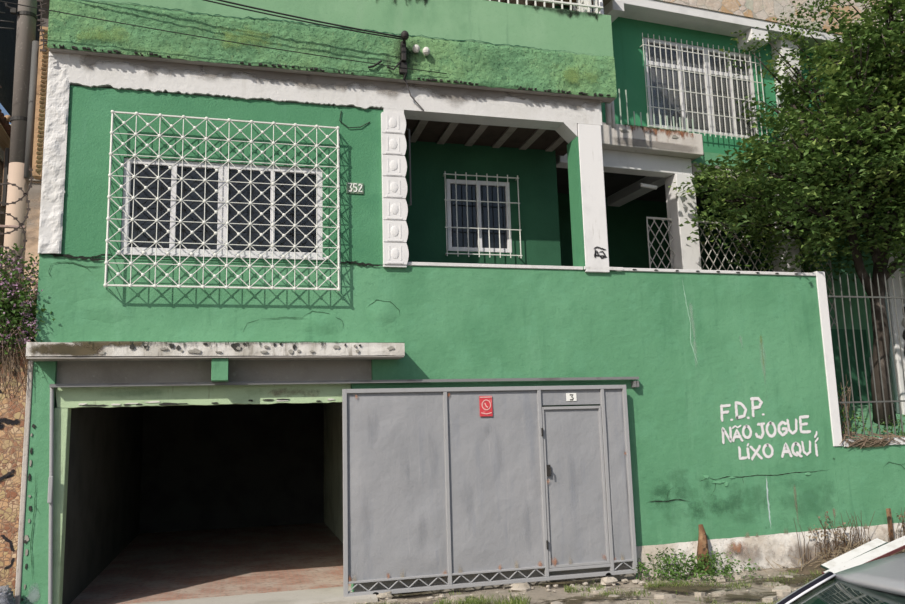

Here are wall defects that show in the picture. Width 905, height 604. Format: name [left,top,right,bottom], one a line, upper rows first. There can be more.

water stain [532,5,599,19]
rust [625,125,693,137]
crack [41,254,111,275]
peeling [160,343,221,353]
crack [701,469,826,494]